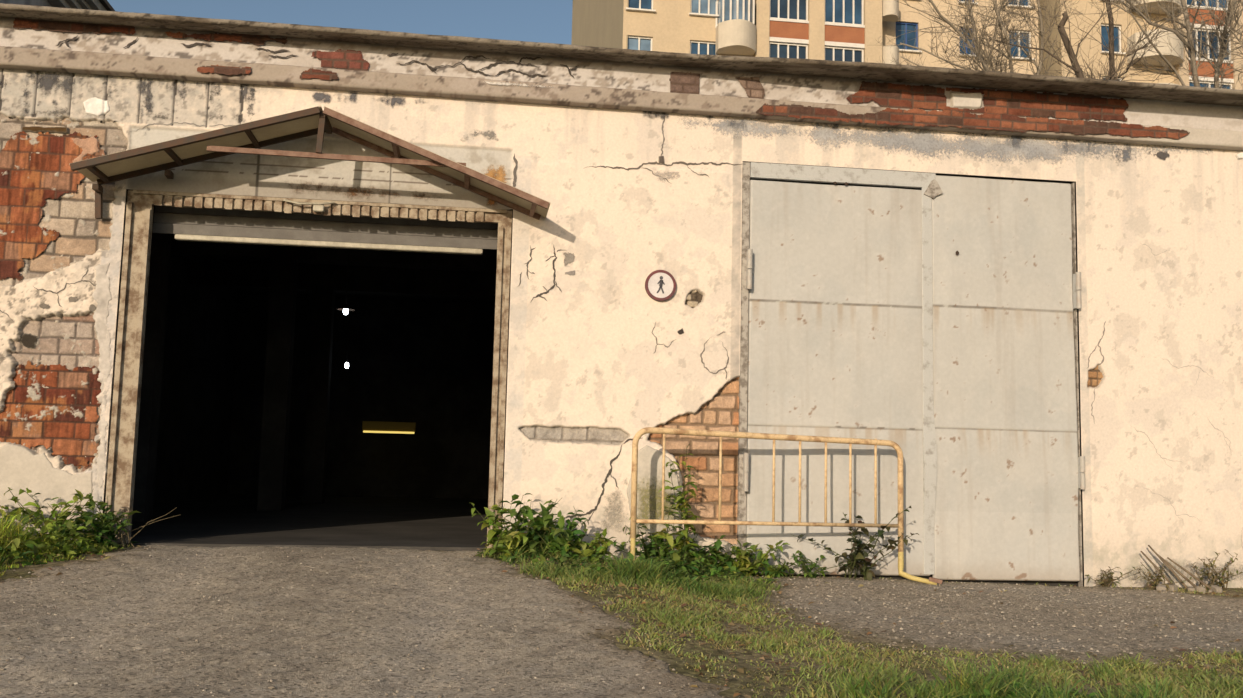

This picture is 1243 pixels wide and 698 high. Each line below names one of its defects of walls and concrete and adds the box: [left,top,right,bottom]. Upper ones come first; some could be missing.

crack [181,40,211,48]
crack [256,47,298,58]
flaking render [300,49,369,80]
crack [387,53,579,77]
flaking render [669,72,700,94]
crack [585,118,746,183]
flaking render [689,77,1210,164]
flaking render [0,97,128,286]
crack [518,244,567,303]
flaking render [0,297,102,472]
crack [564,438,641,525]
flaking render [648,377,739,544]